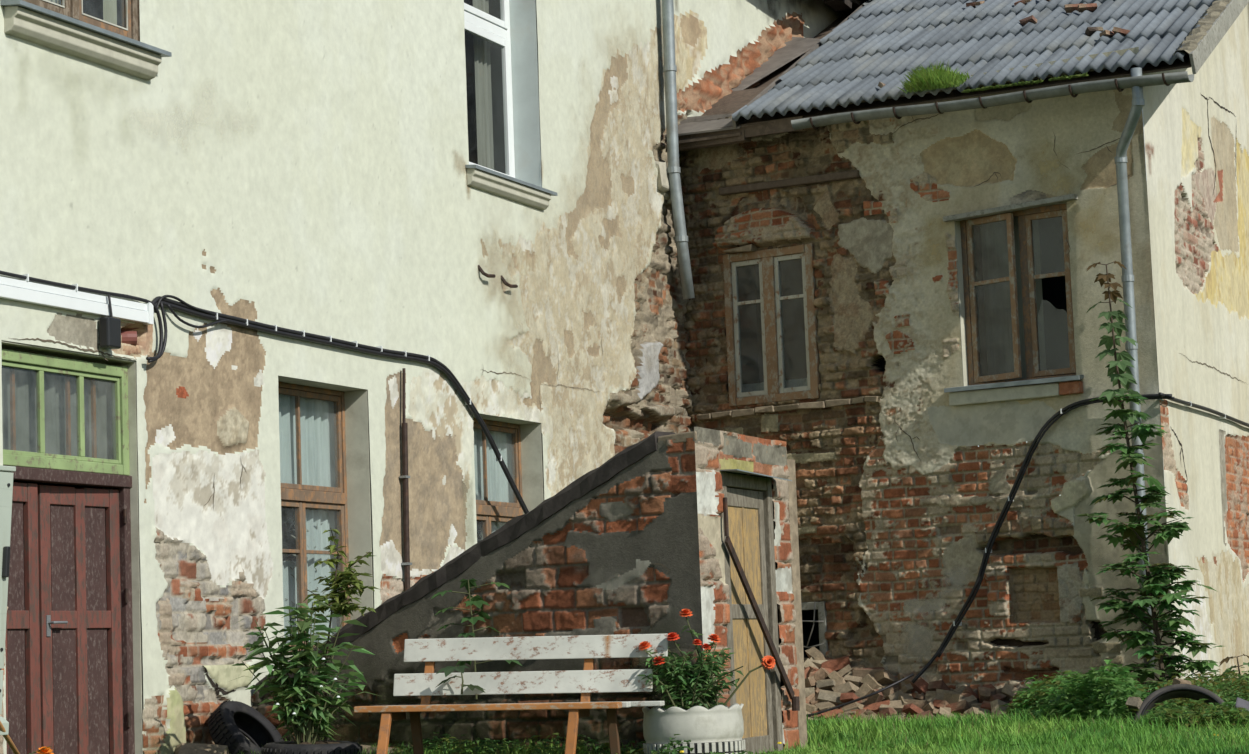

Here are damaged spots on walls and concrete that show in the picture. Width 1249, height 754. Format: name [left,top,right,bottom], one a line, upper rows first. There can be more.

flaking render [1080,88,1144,190]
peeling [1174,108,1249,320]
spalling [379,10,1123,689]
crack [1186,357,1243,382]
flaking render [47,288,273,754]
flaking render [1181,429,1249,681]